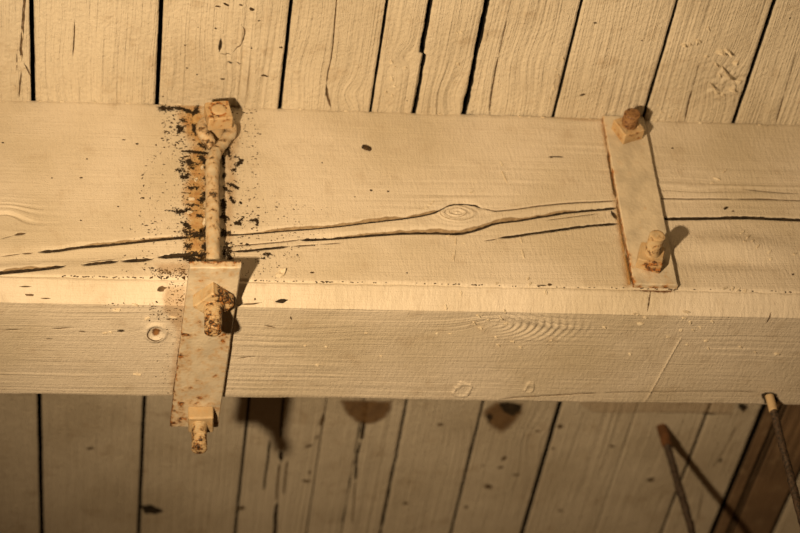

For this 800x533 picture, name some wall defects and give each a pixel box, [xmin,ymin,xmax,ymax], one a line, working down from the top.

crack [0,233,191,287]
corrosion [182,107,206,254]
crack [223,129,631,282]
crack [660,189,800,221]